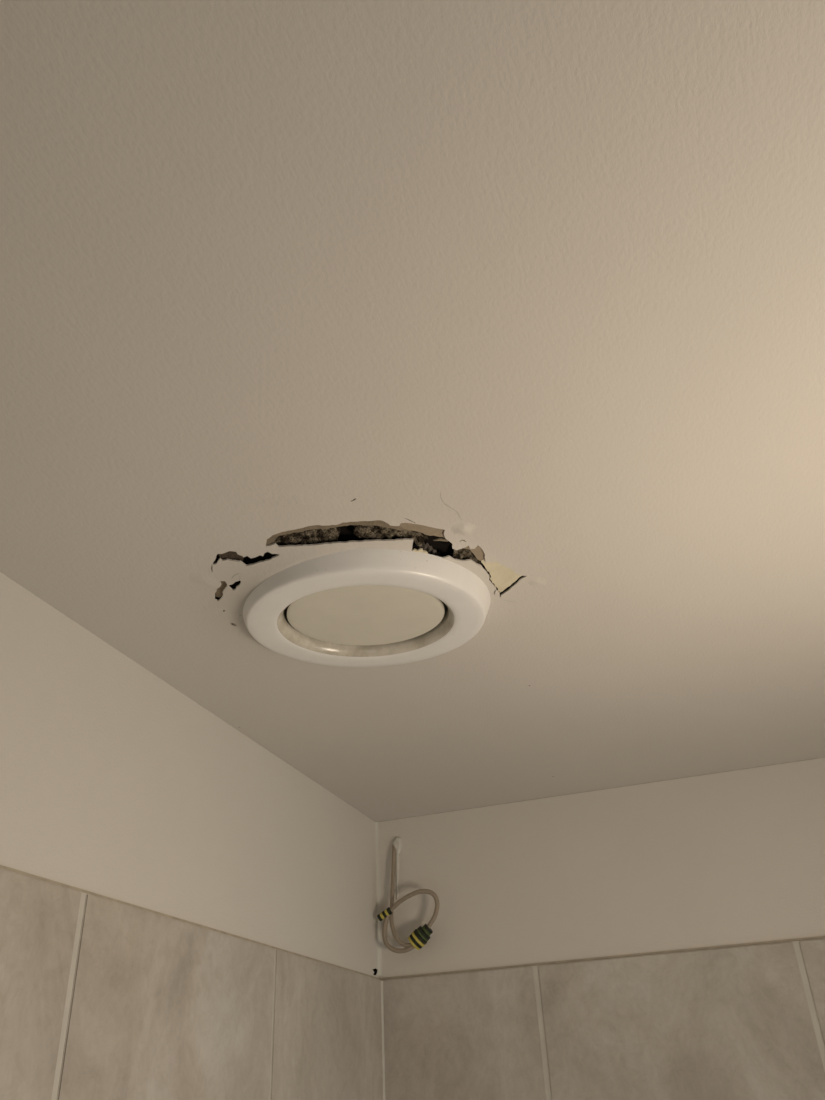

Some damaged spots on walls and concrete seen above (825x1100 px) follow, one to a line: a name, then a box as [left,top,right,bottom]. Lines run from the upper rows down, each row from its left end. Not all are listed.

spalling [215,581,227,598]
flaking render [266,518,524,602]